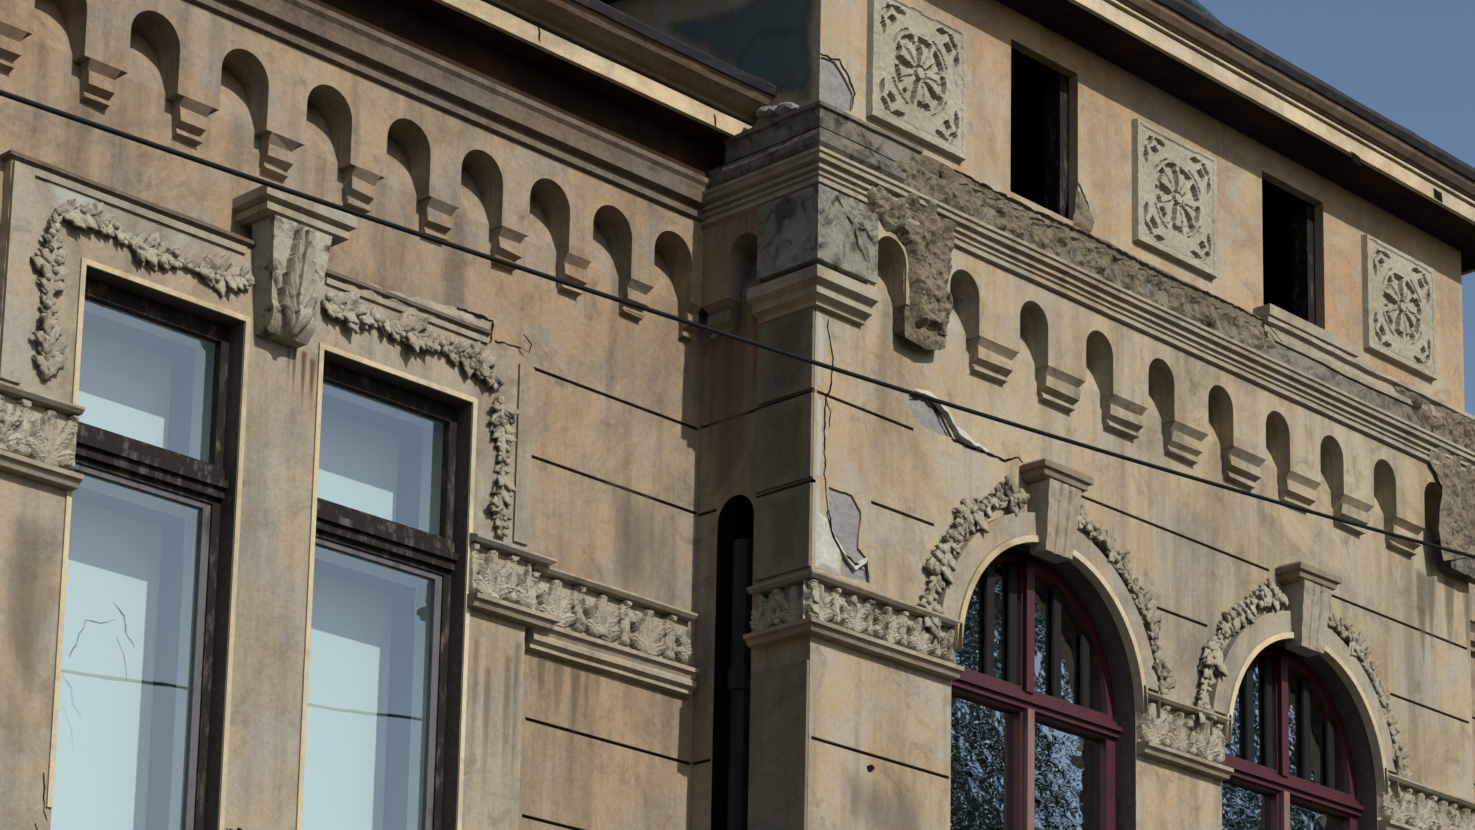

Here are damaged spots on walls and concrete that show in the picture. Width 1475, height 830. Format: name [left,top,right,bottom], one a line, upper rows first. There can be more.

damp [674,0,811,97]
flaking render [820,53,856,111]
crack [824,319,834,507]
flaking render [814,314,871,583]
flaking render [909,388,1023,462]